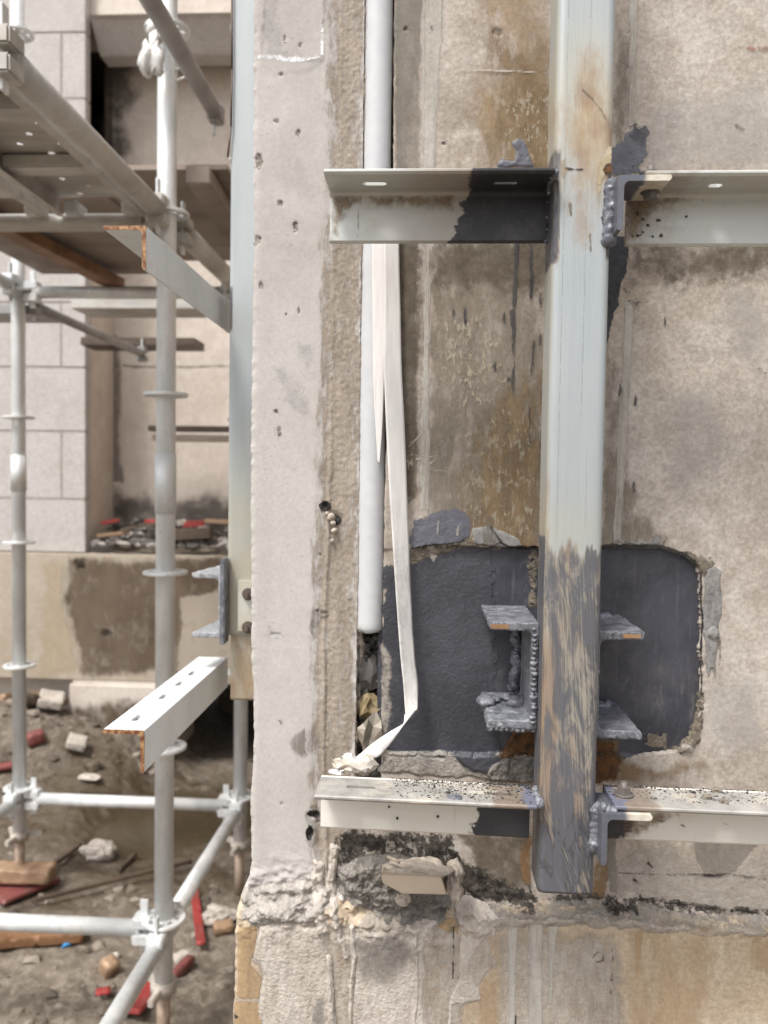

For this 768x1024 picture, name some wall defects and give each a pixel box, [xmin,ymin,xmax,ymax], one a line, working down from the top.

water stain [394,0,442,168]
water stain [399,244,546,510]
spalling [685,552,715,577]
water stain [66,558,156,675]
water stain [175,557,231,679]
peeling [381,645,392,736]
rust [499,730,535,760]
rust [595,739,654,784]
rust [643,733,669,750]